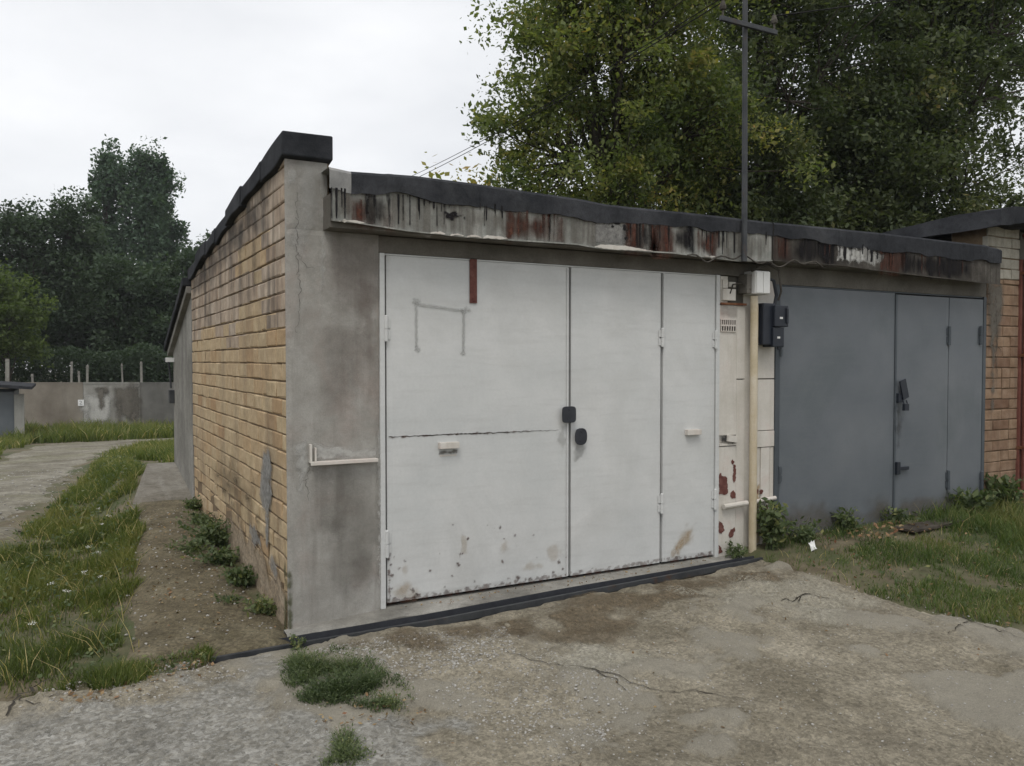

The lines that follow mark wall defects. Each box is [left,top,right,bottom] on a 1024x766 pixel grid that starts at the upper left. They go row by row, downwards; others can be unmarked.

corrosion [507,211,563,240]
corrosion [625,223,673,259]
corrosion [698,230,718,256]